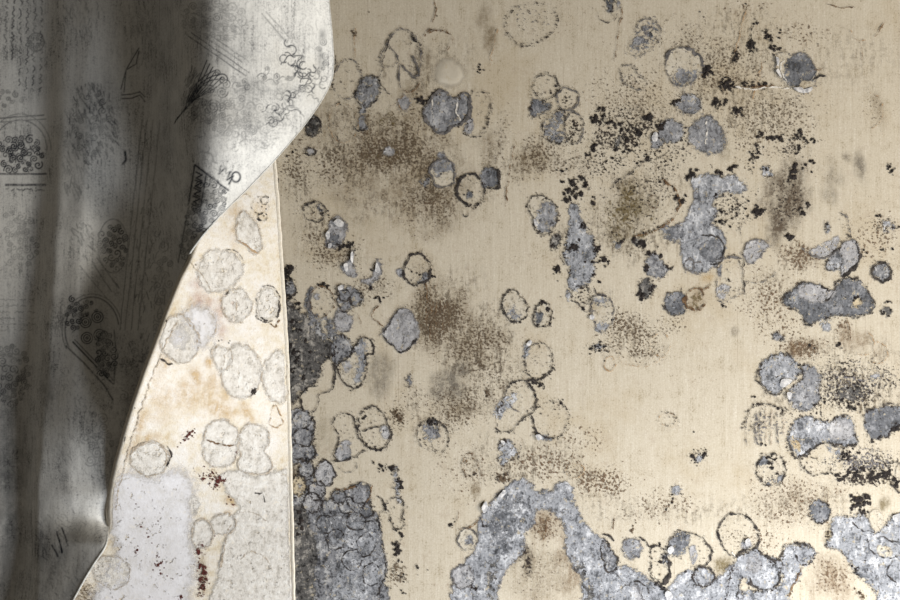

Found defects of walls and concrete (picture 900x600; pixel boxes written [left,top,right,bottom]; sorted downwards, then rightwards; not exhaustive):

water stain [278,89,472,306]
peeling [525,192,598,293]
water stain [478,1,900,426]
peeling [636,164,748,319]
peeling [779,237,894,332]
peeling [77,211,420,600]
water stain [384,258,704,525]
peeling [755,331,900,460]
water stain [194,541,210,597]
water stain [388,517,419,594]
peeling [449,478,900,600]
water stain [750,444,900,559]